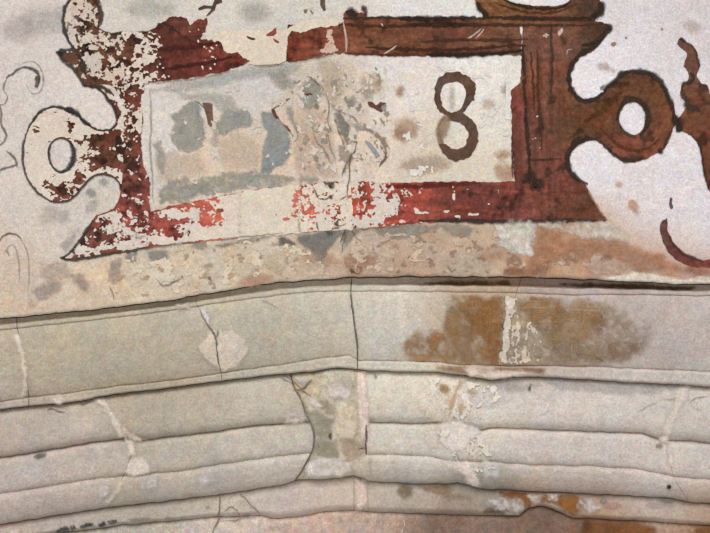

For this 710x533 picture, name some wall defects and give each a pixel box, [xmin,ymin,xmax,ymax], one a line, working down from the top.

peeling [24,0,629,293]
crack [200,310,221,369]
crack [350,266,362,363]
peeling [429,296,555,421]
crack [280,375,315,478]